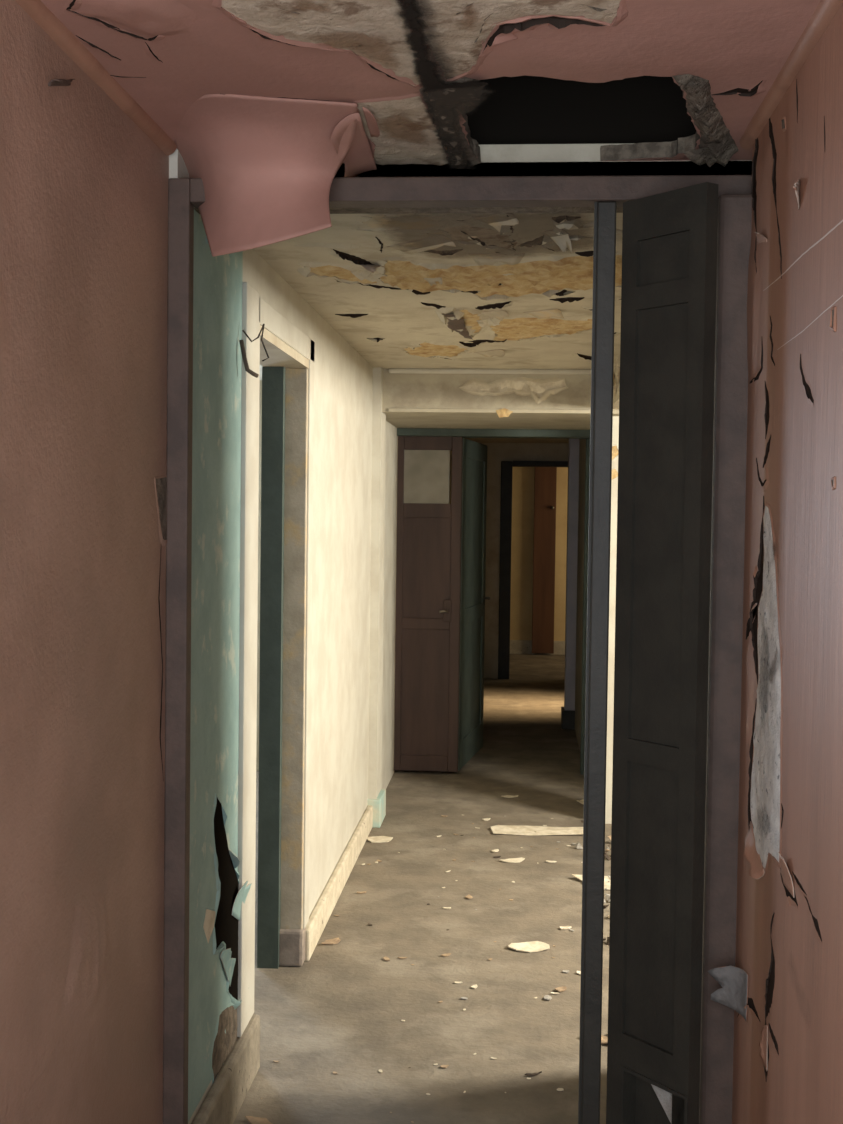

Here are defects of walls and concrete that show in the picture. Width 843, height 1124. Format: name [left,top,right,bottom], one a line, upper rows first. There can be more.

crack [63,0,165,78]
peeling [174,0,629,257]
damp [408,0,491,169]
spalling [672,74,738,167]
crack [711,79,826,279]
spalling [297,222,594,358]
crack [749,313,814,491]
spalling [744,495,783,879]
spalling [202,908,215,945]
peeling [220,948,236,986]
peeling [231,881,252,921]
crack [737,803,823,1082]